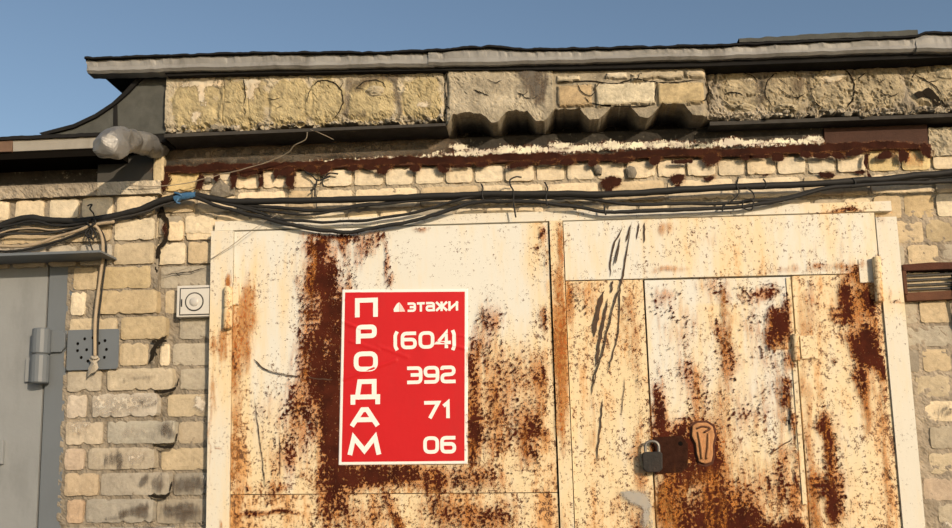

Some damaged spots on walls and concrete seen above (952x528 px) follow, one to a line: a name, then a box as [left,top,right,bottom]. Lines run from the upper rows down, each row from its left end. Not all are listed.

crack [217,78,293,119]
spalling [166,113,443,133]
crack [307,79,386,119]
rust [152,140,932,192]
rust [212,274,257,392]
rust [231,223,608,528]
rust [613,278,858,528]
rust [803,261,897,420]